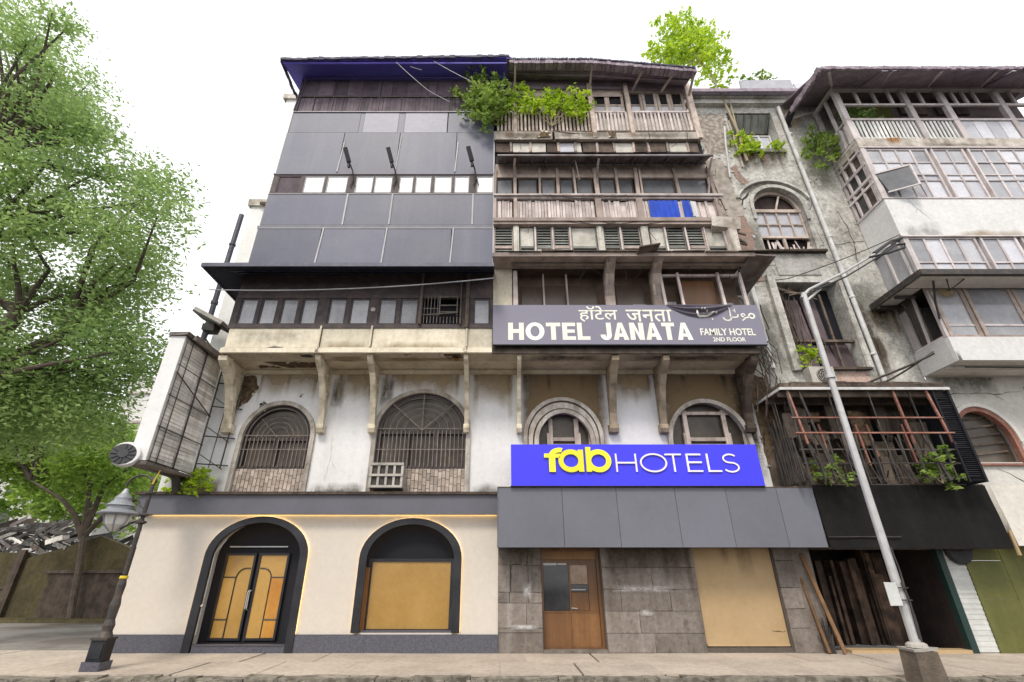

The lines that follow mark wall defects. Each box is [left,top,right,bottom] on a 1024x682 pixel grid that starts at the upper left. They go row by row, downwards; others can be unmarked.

spalling [238,366,267,411]